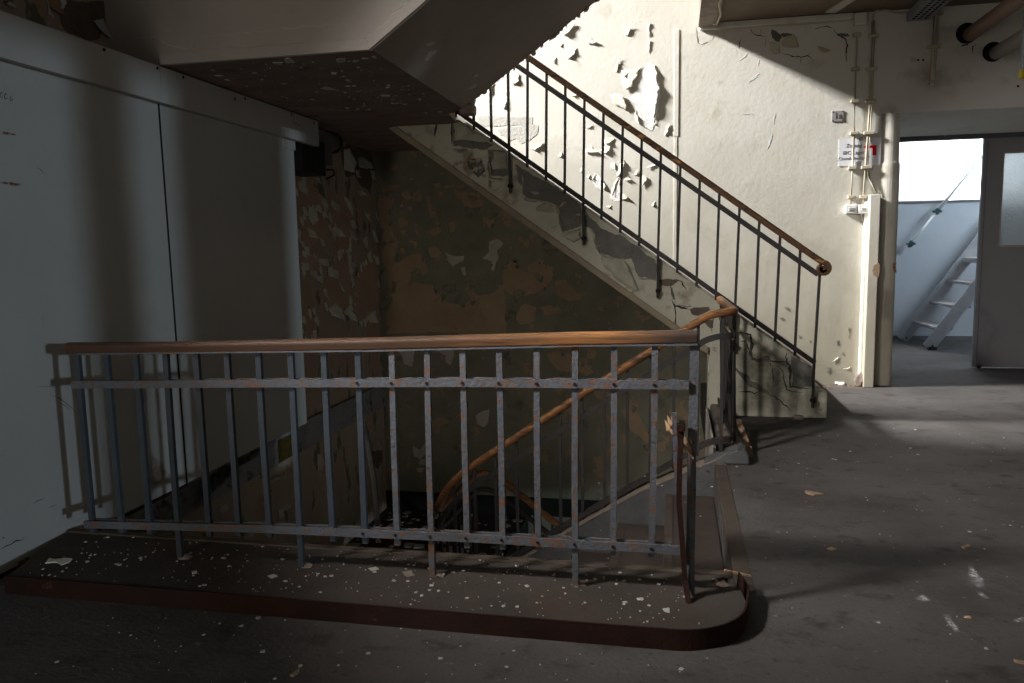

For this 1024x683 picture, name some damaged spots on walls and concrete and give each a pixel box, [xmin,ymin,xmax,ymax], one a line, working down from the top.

crack [816,26,849,62]
peeling [452,0,710,316]
peeling [296,176,345,283]
peeling [350,212,508,335]
peeling [302,307,319,339]
crack [674,305,714,331]
peeling [547,349,597,377]
crack [739,332,812,393]